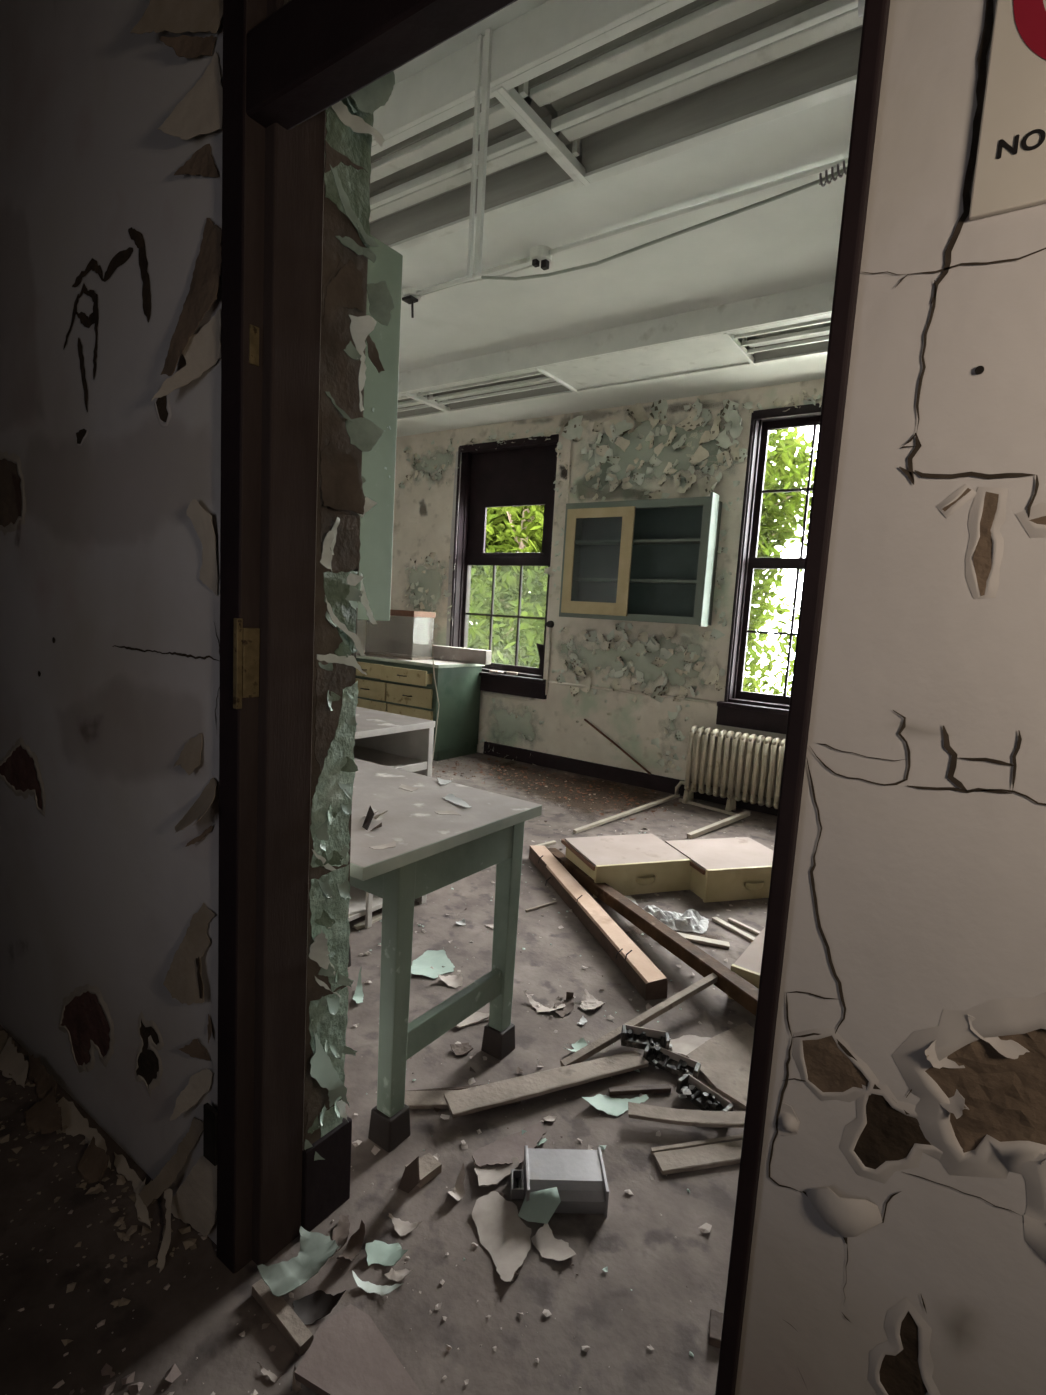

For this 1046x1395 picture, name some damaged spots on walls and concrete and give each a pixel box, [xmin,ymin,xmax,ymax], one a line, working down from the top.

peeling [130,0,223,34]
peeling [158,52,223,178]
peeling [151,218,222,428]
crack [864,0,1046,518]
peeling [303,71,395,1161]
peeling [398,389,822,703]
spalling [936,484,1046,599]
crack [768,710,1046,1197]
peeling [56,957,217,1273]
spalling [792,992,1046,1262]
crack [882,1172,1017,1223]
spalling [867,1298,941,1395]